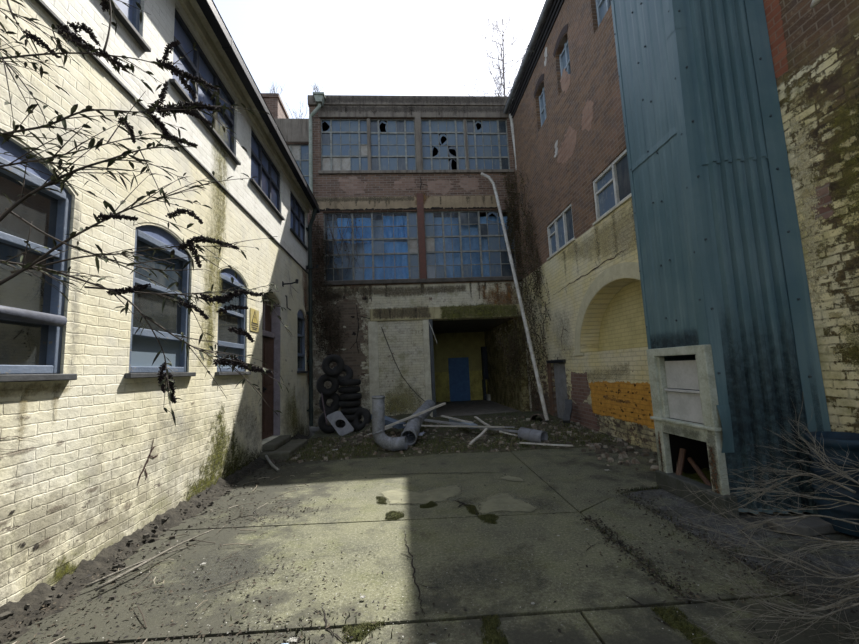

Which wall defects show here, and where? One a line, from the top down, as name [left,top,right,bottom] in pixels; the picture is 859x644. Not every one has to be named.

peeling [786,80,859,316]
damp [207,254,221,365]
damp [325,282,486,319]
peeling [570,372,655,432]
crack [401,531,436,617]